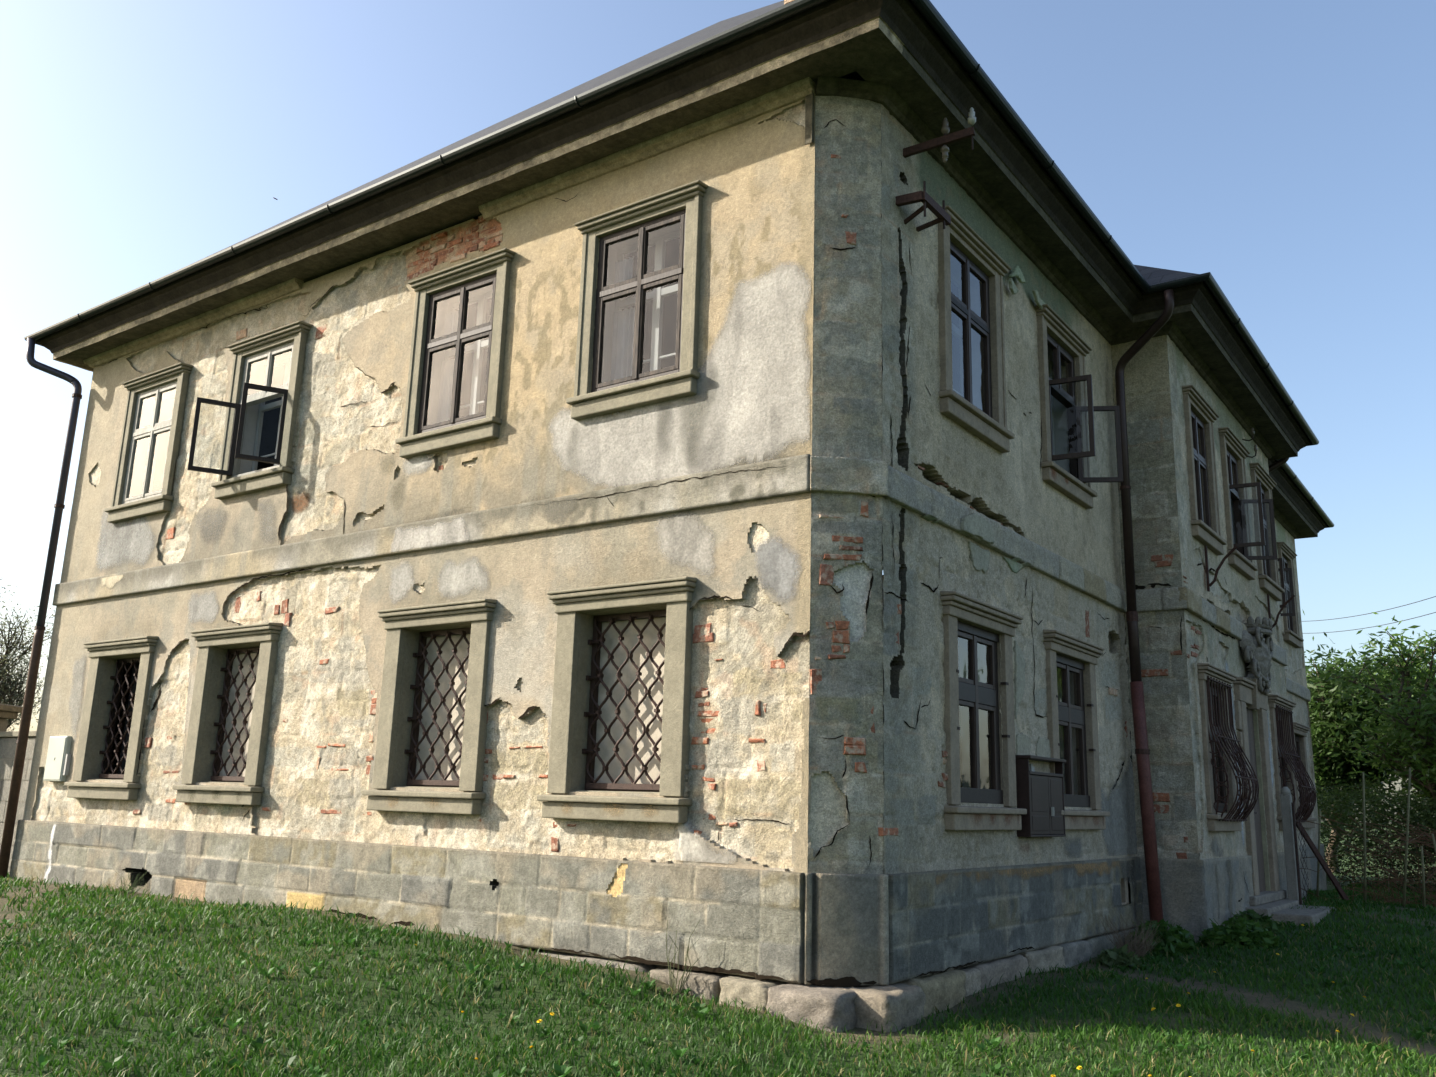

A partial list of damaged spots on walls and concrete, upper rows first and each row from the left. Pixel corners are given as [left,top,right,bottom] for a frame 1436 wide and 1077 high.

peeling [126,216,503,565]
crack [339,367,399,427]
crack [890,227,931,472]
spalling [747,522,769,553]
flaking render [819,535,863,586]
crack [831,495,942,653]
peeling [961,506,1032,574]
peeling [31,565,850,872]
flaking render [843,632,905,773]